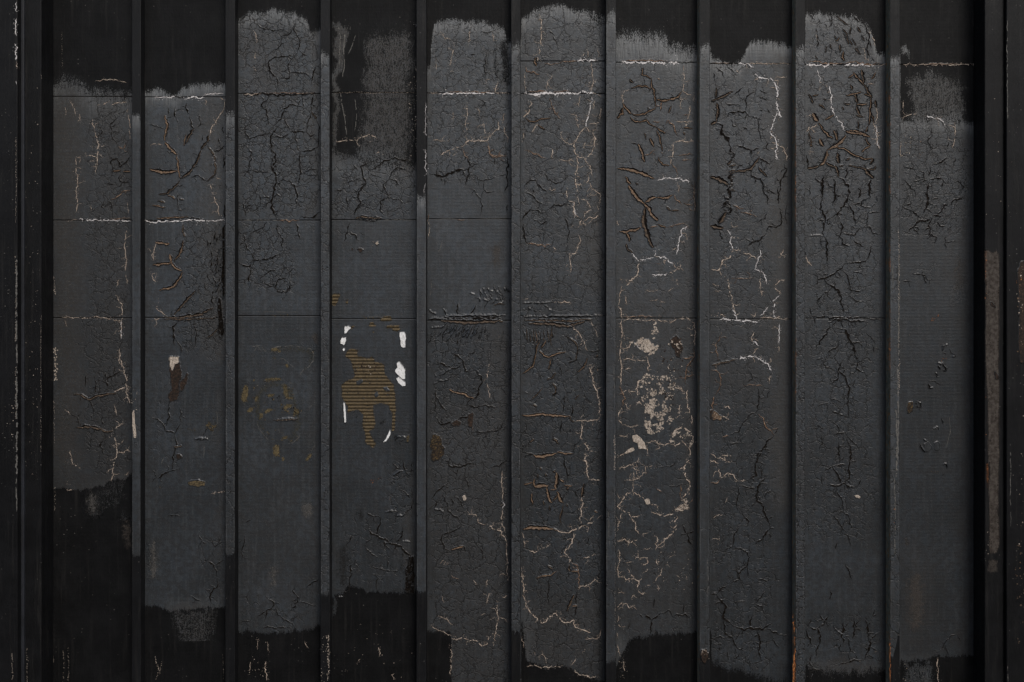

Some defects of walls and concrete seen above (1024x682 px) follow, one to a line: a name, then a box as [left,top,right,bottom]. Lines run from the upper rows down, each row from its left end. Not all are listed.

crack [862,21,875,61]
crack [73,111,131,213]
crack [150,15,602,293]
crack [65,230,131,480]
peeling [167,355,189,403]
peeling [339,325,410,448]
spalling [364,315,407,348]
crack [241,62,964,673]
peeling [614,314,694,468]